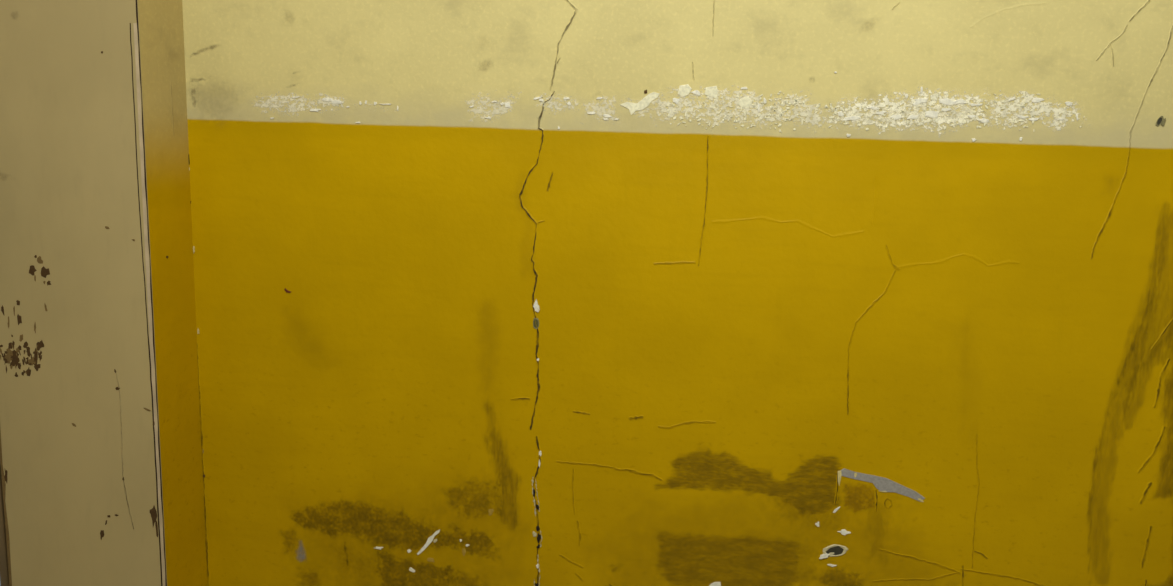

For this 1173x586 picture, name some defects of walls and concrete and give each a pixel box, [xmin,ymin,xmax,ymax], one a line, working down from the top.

crack [1096,0,1151,67]
crack [1090,24,1173,259]
crack [511,0,663,586]